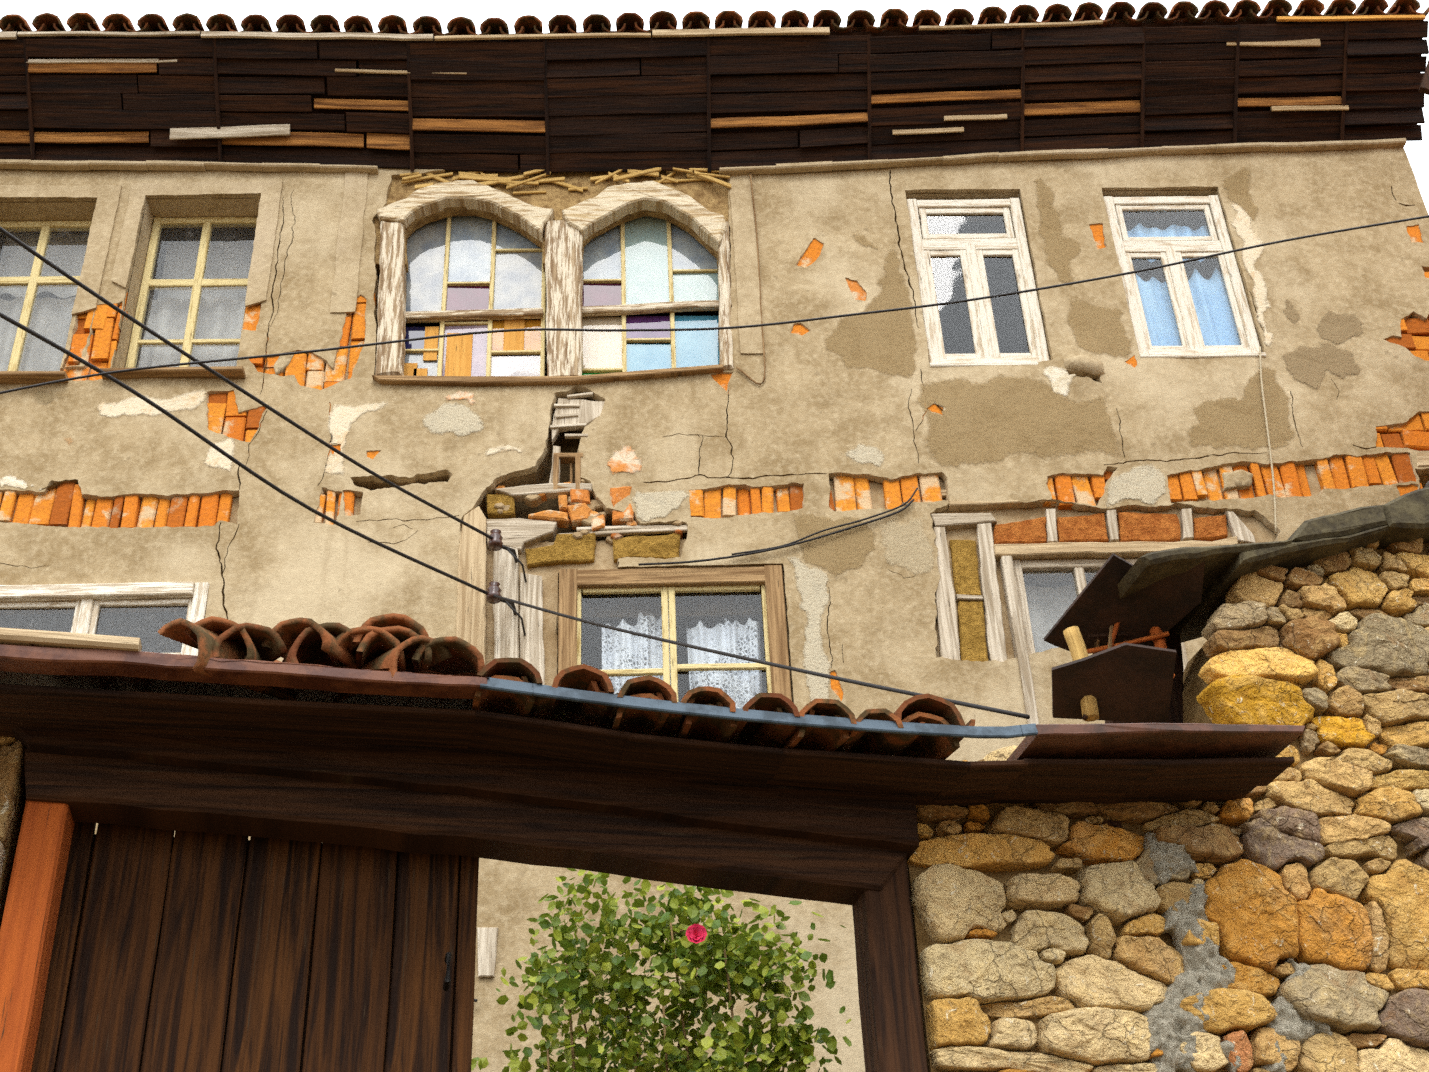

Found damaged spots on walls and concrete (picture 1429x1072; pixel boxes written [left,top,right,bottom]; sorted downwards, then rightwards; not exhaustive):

flaking render [1034,179,1107,283]
flaking render [1223,167,1300,345]
flaking render [1406,224,1424,243]
flaking render [64,292,128,381]
flaking render [0,476,240,528]
flaking render [98,390,266,471]
flaking render [242,293,387,525]
flaking render [423,391,483,436]
flaking render [459,235,1429,701]